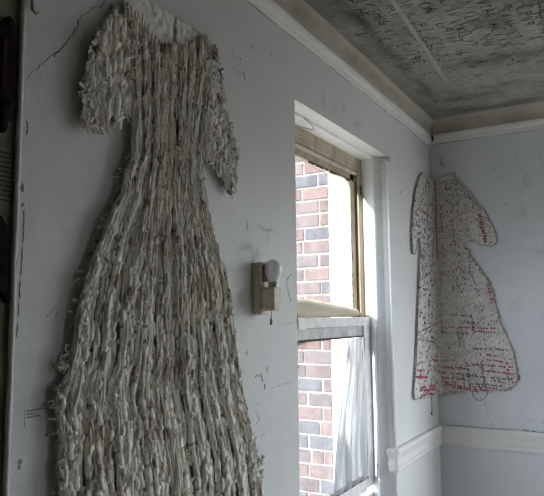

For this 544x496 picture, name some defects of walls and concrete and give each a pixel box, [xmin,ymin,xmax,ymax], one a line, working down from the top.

crack [27,0,106,79]